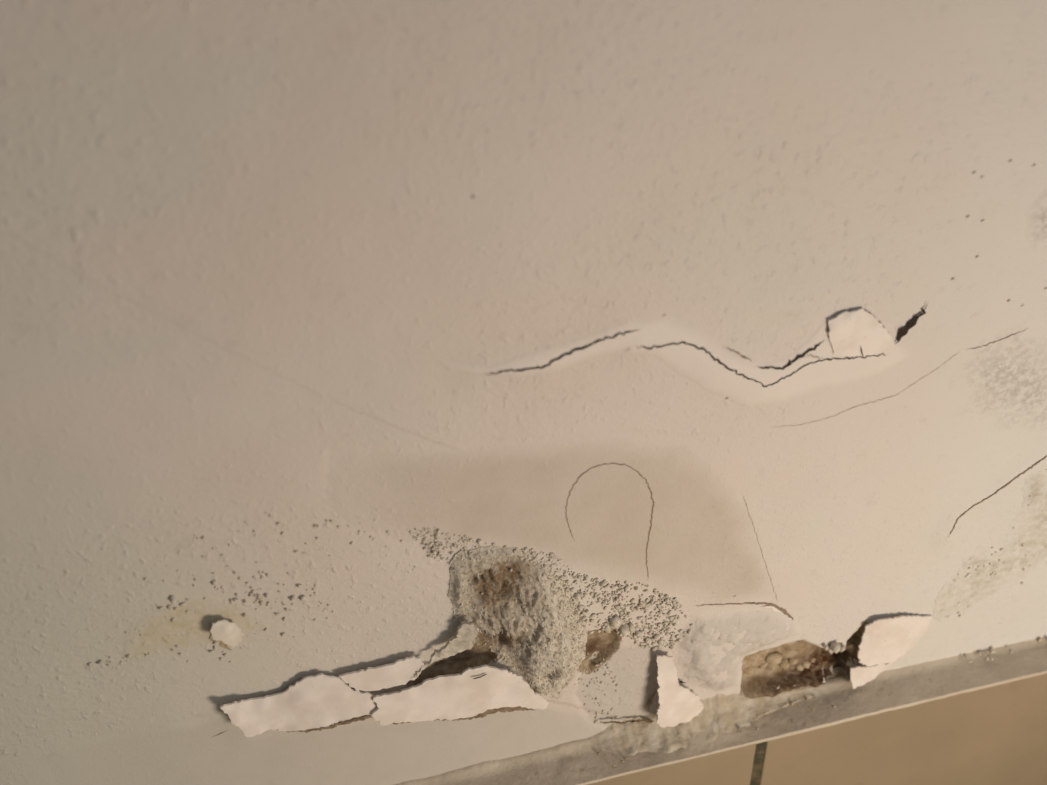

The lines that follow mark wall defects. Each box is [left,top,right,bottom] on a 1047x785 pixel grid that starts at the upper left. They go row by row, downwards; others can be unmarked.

crack [482,303,928,387]
crack [948,456,1047,538]
peeling [156,574,280,663]
peeling [220,621,550,737]
spalling [558,574,704,728]
spalling [740,615,932,699]